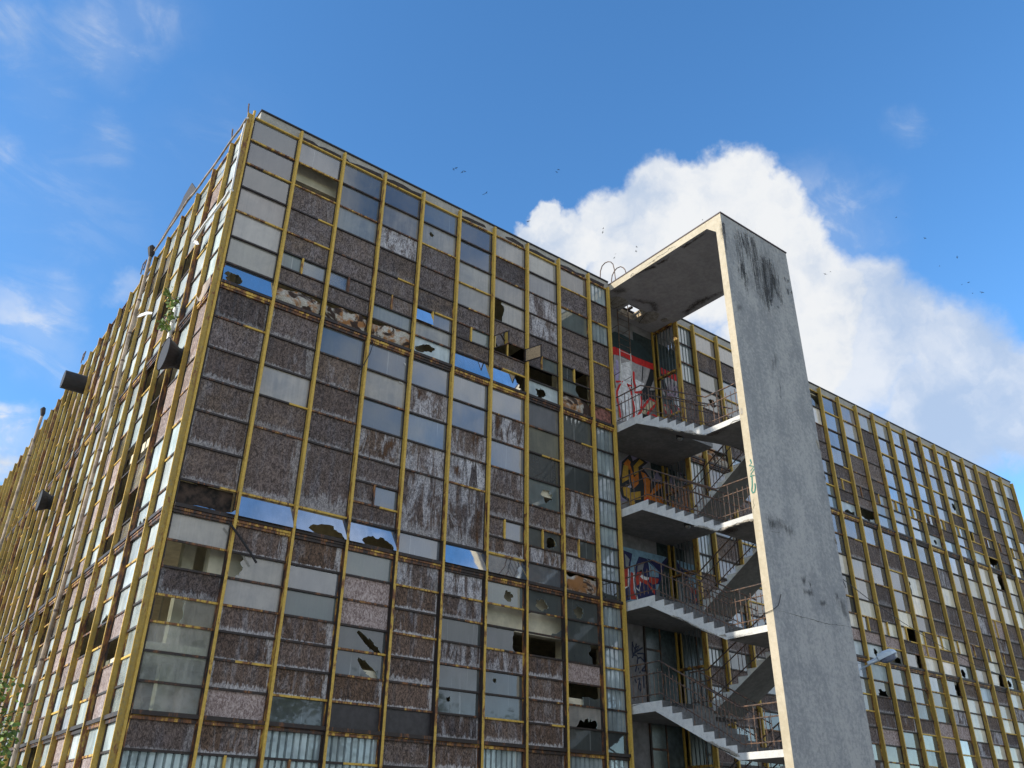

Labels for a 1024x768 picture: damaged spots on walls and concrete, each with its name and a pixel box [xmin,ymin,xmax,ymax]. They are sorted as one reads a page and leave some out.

damp [720,222,789,308]